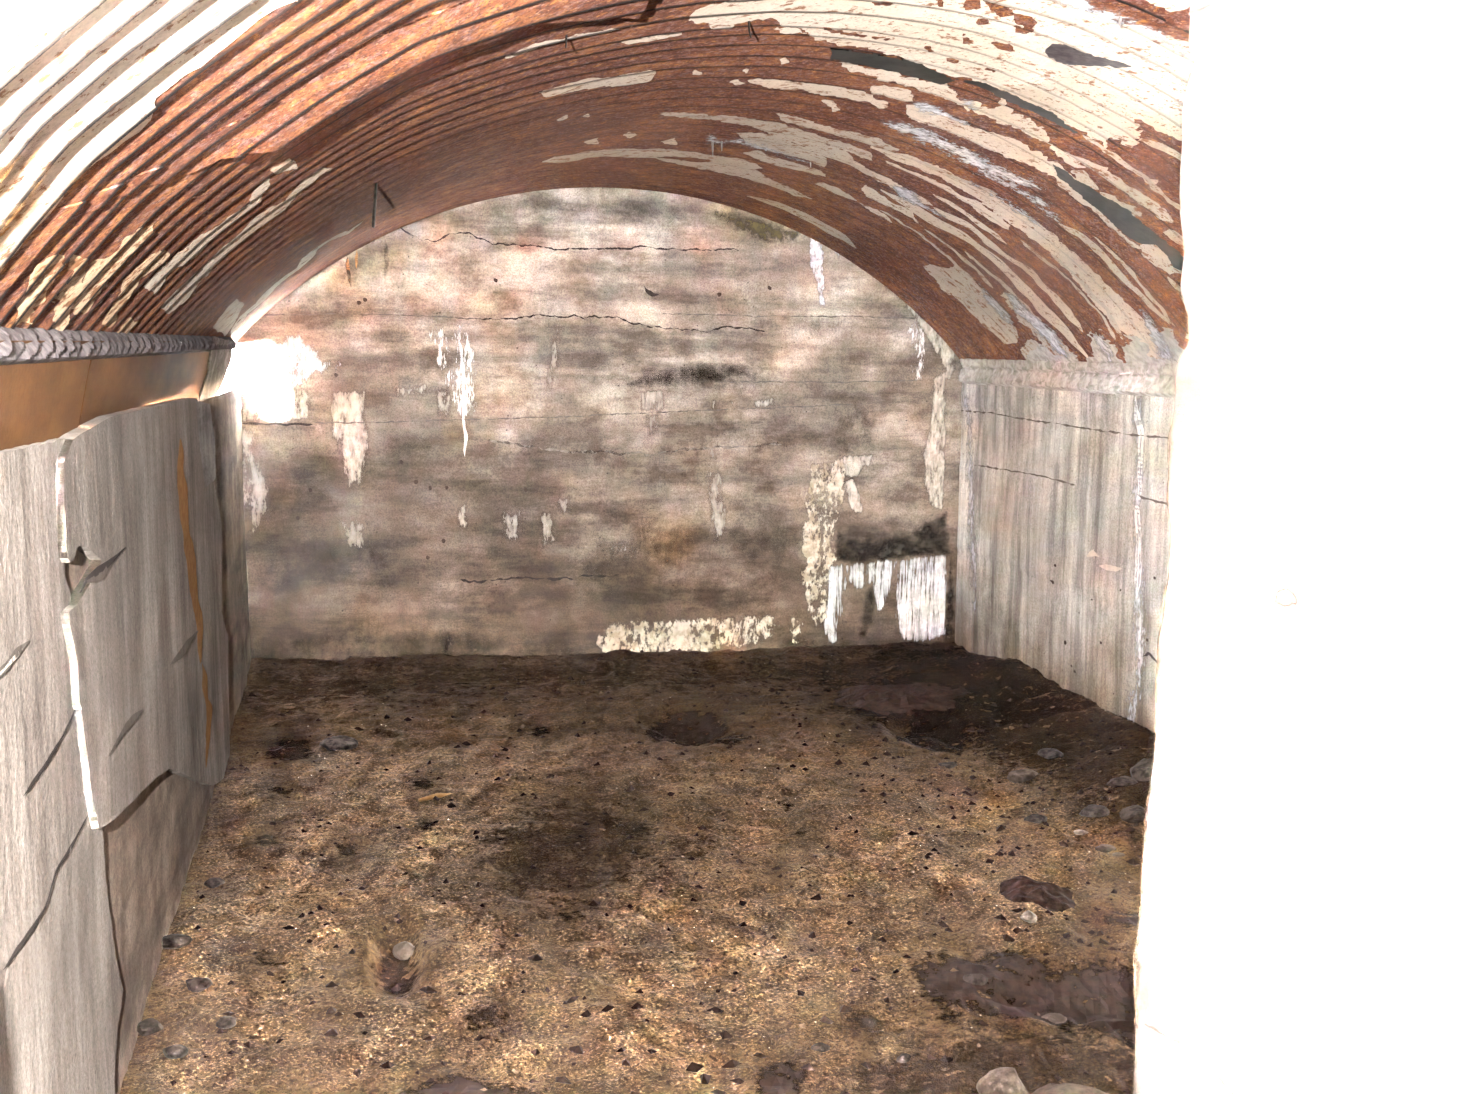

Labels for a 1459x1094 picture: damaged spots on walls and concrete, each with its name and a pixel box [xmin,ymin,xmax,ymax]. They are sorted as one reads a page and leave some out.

corrosion [823,0,1078,133]
corrosion [1156,8,1190,30]
peeling [0,0,297,271]
peeling [11,158,332,334]
peeling [213,221,363,336]
peeling [505,0,1195,360]
corrosion [1053,165,1184,271]
corrosion [1118,117,1182,224]
leakage [242,429,266,527]
leakage [331,391,368,483]
leakage [398,324,477,456]
leakage [786,305,955,648]